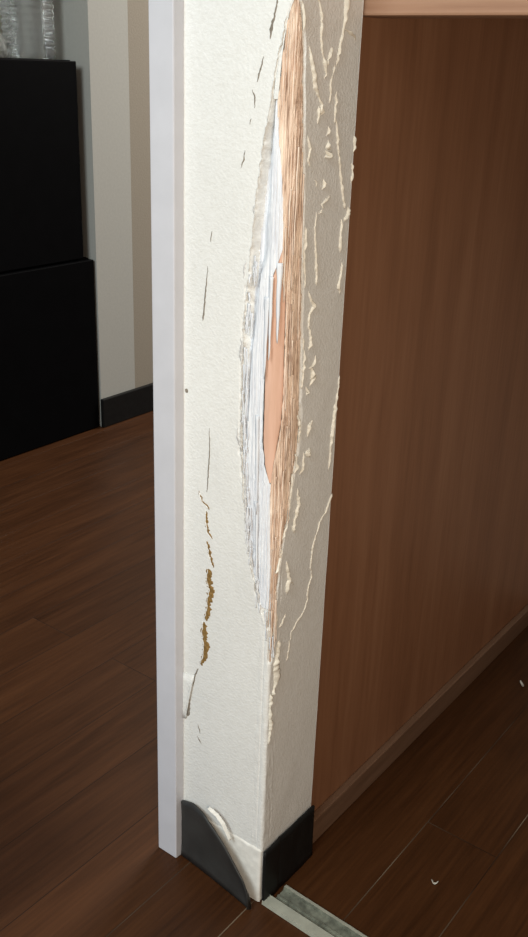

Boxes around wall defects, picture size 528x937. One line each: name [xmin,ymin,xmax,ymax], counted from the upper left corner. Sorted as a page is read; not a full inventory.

peeling [183,668,199,718]
spalling [236,0,356,745]